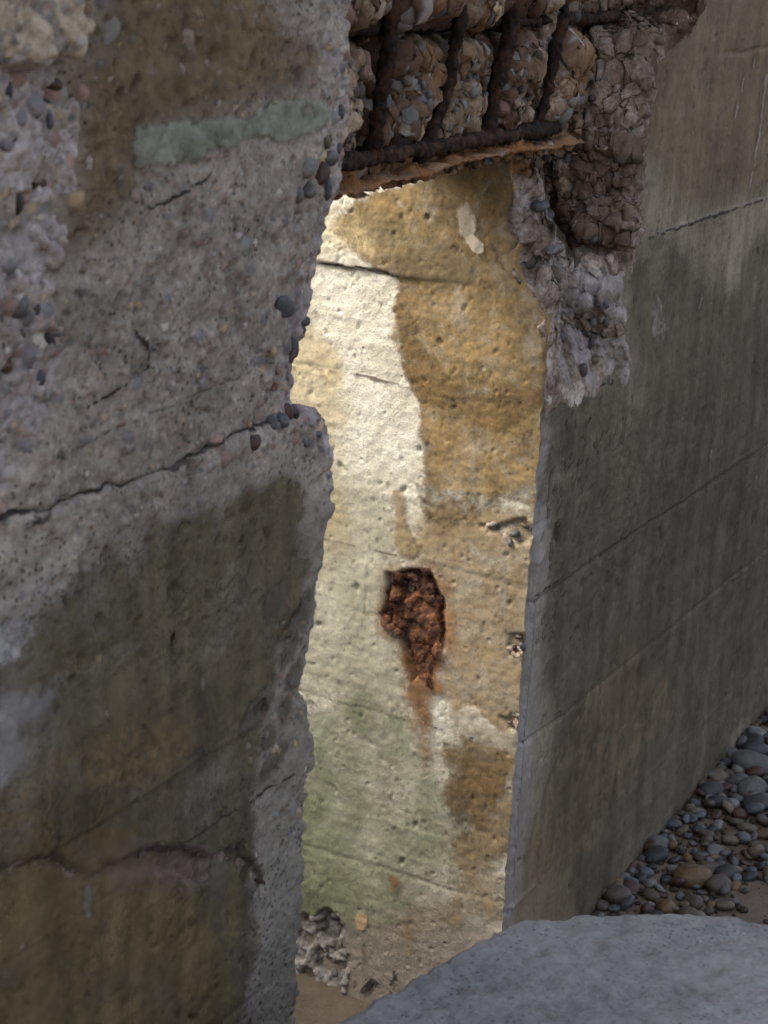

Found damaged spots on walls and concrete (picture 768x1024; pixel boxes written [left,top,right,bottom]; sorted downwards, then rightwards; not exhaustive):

leakage [69,0,319,238]
spalling [267,0,703,459]
crack [649,198,767,239]
crack [0,419,279,526]
spalling [250,434,261,451]
leakage [334,158,768,924]
leakage [0,472,312,1024]
rust [400,631,447,754]